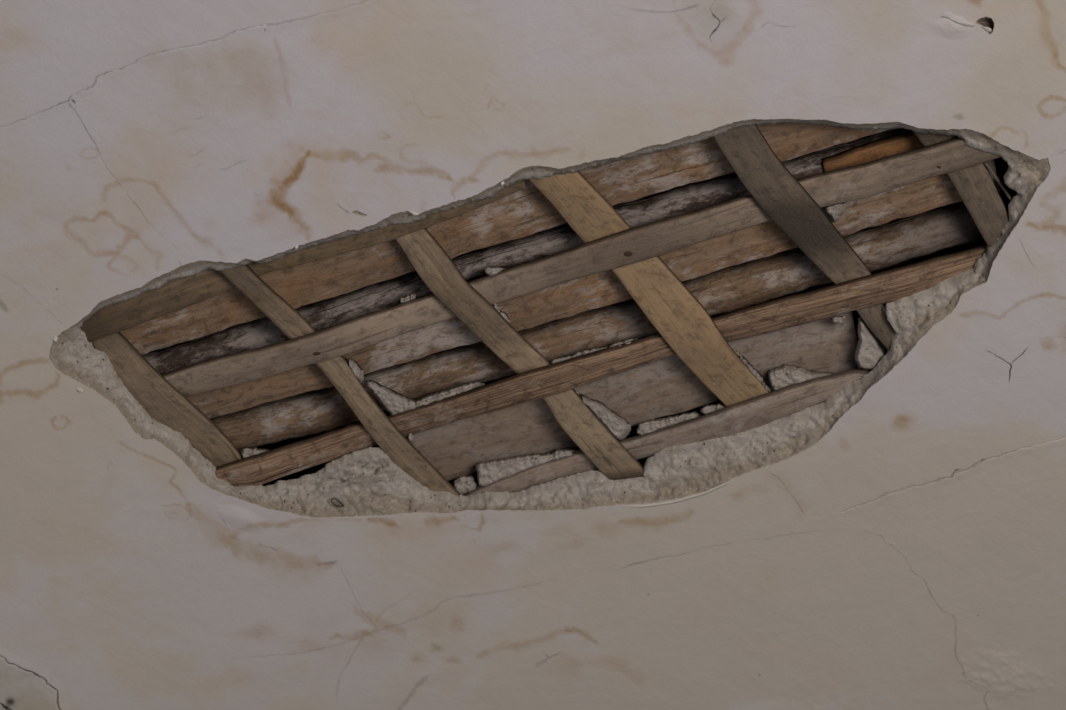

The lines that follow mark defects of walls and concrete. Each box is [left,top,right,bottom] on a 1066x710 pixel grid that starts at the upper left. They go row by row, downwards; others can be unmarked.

flaking render [941,12,994,34]
flaking render [49,119,1050,518]
crack [0,647,71,710]